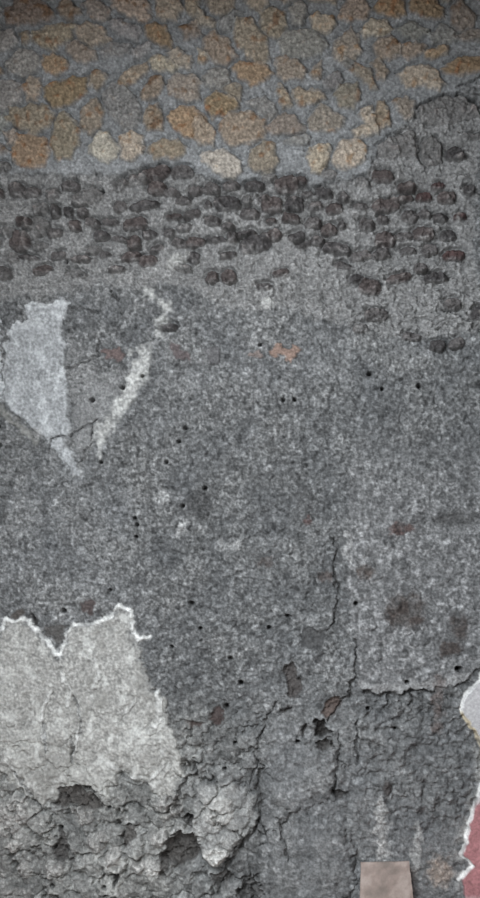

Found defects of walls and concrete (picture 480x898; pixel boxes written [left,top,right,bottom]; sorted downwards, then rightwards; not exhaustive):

spalling [0,95,480,479]
crack [327,538,341,632]
crack [327,638,436,798]
flaking render [459,672,480,747]
crack [224,701,294,869]
spalling [52,825,75,863]
spalling [103,872,121,891]
spalling [119,823,140,849]
spalling [157,815,201,878]
spalling [210,868,265,898]
flaking render [456,783,480,898]